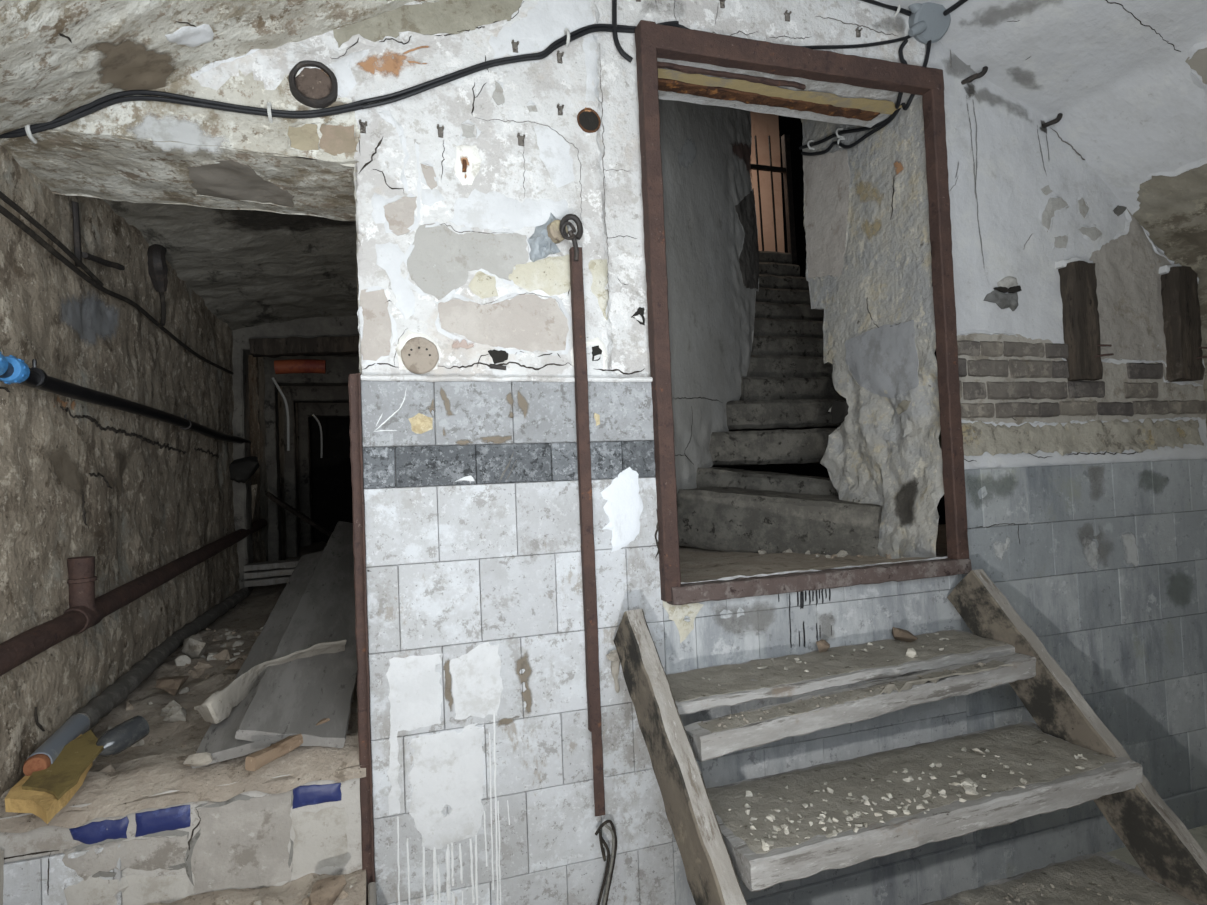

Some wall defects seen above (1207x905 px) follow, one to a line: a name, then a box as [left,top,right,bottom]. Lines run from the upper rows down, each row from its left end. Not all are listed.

crack [1106,0,1181,52]
rust [358,46,429,76]
peeling [333,0,600,105]
peeling [1185,41,1207,94]
peeling [357,100,575,366]
spalling [631,307,645,325]
flaking render [957,157,1207,428]
spalling [592,345,602,361]
crack [60,406,219,458]
spalling [831,400,849,424]
water stain [444,660,453,711]
peeling [62,789,349,895]